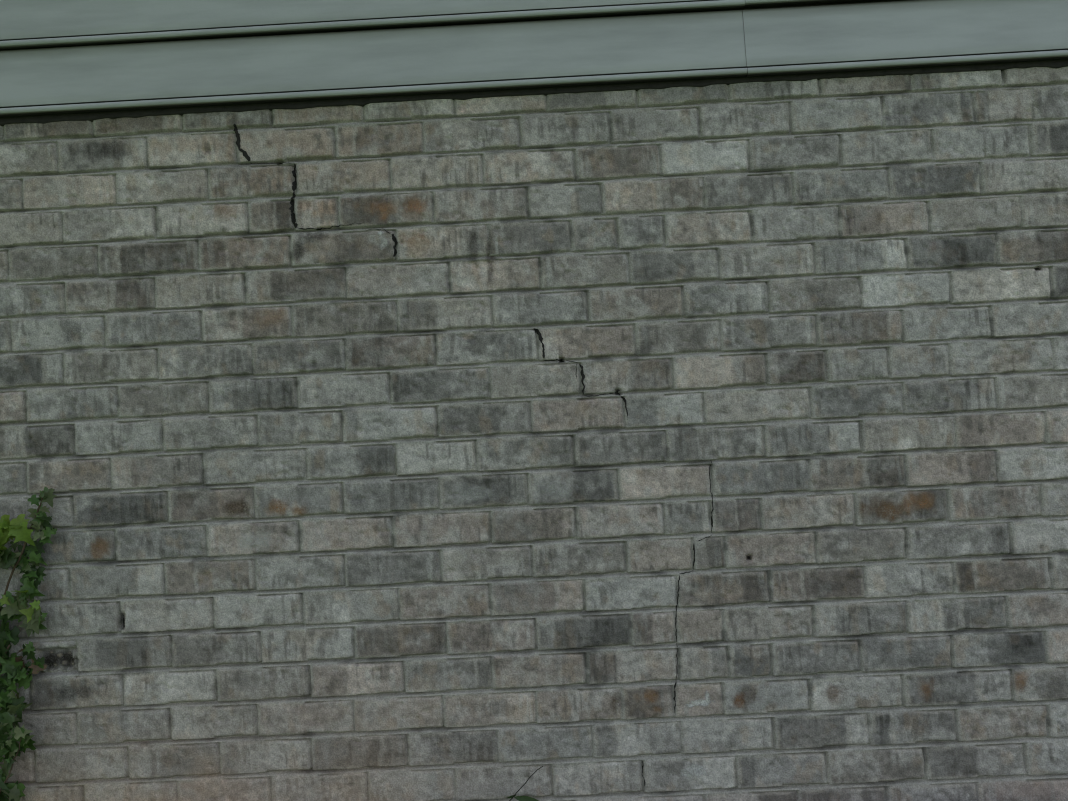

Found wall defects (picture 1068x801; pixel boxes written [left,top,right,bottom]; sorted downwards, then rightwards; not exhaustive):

crack [233,124,398,257]
crack [534,328,628,420]
crack [673,461,714,710]